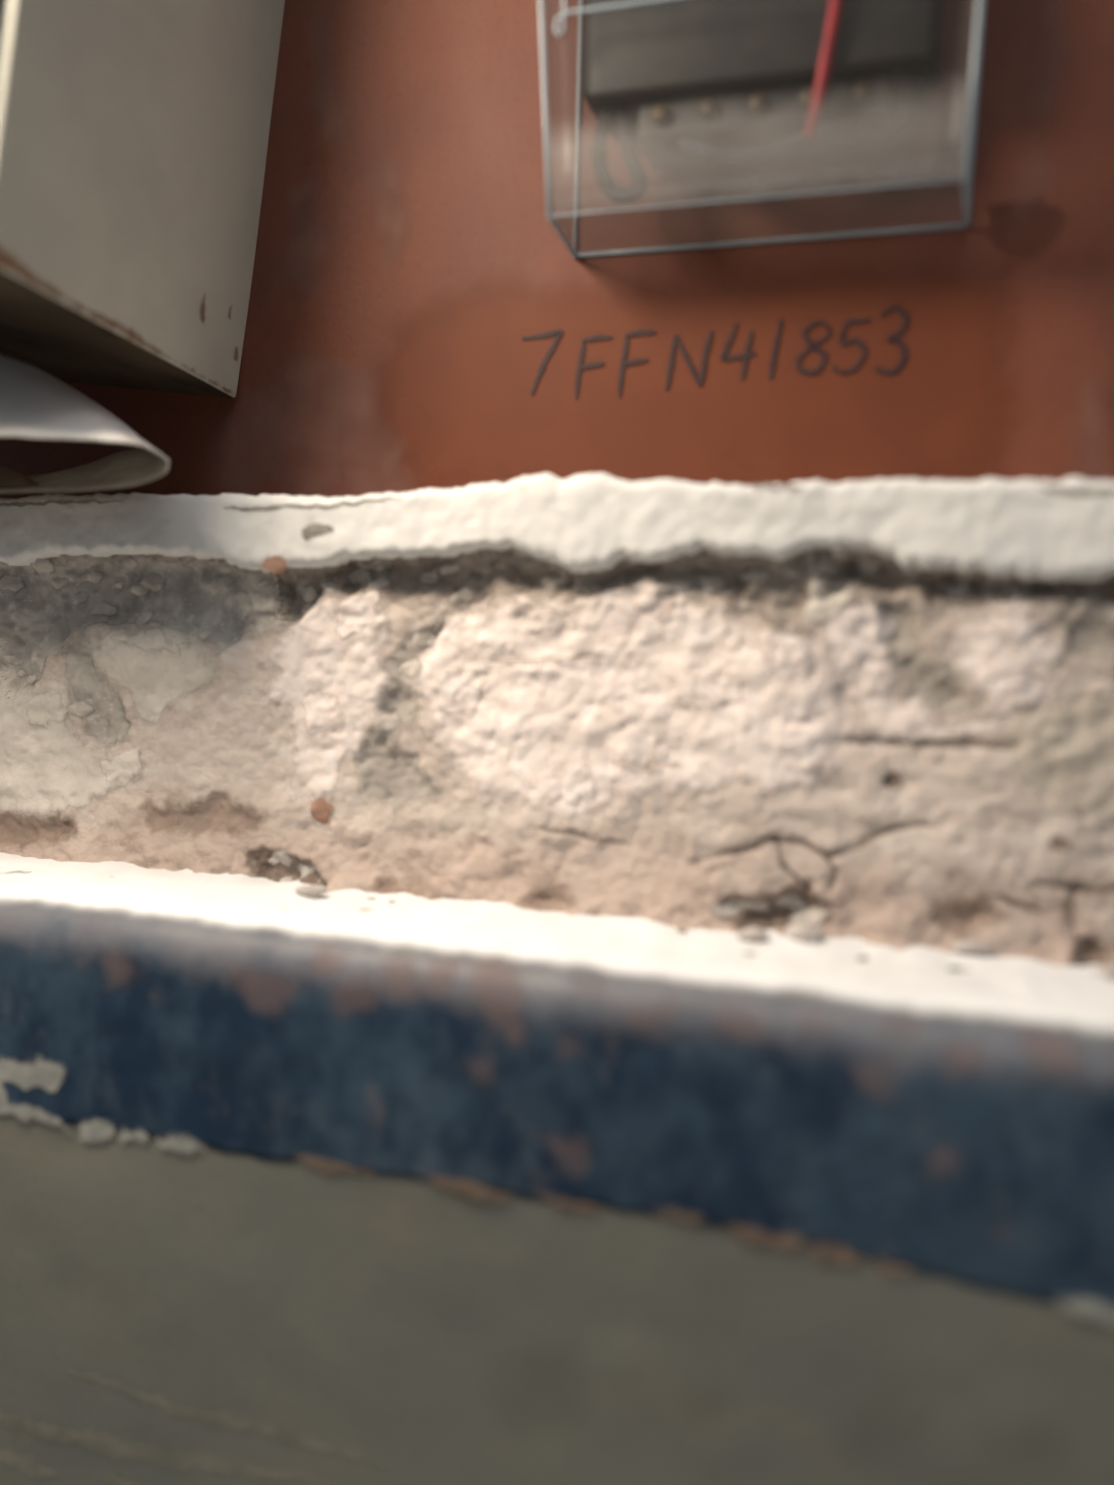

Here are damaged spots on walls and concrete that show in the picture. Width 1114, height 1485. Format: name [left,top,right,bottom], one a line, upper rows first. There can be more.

peeling [0,547,1114,846]
spalling [1050,836,1070,851]
spalling [246,847,327,887]
spalling [376,878,450,900]
spalling [528,891,573,909]
spalling [714,884,830,930]
spalling [934,899,1002,932]
spalling [1071,937,1105,966]
peeling [0,1058,201,1154]